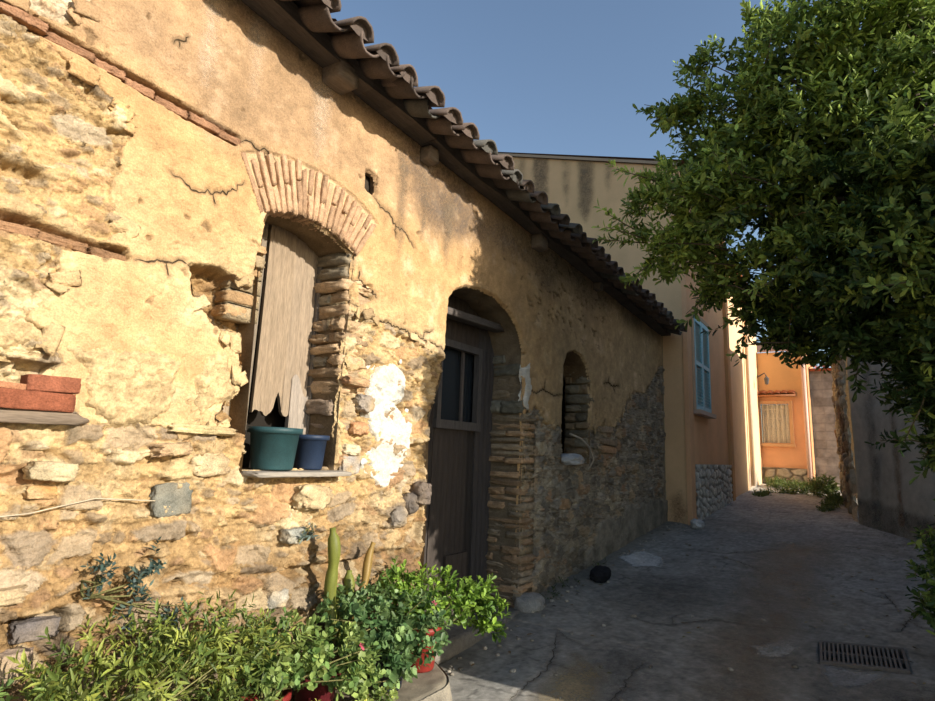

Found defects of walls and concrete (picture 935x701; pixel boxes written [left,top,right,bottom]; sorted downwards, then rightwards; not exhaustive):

spalling [0,0,241,324]
crack [174,175,244,204]
spalling [512,363,667,608]
crack [510,629,580,699]